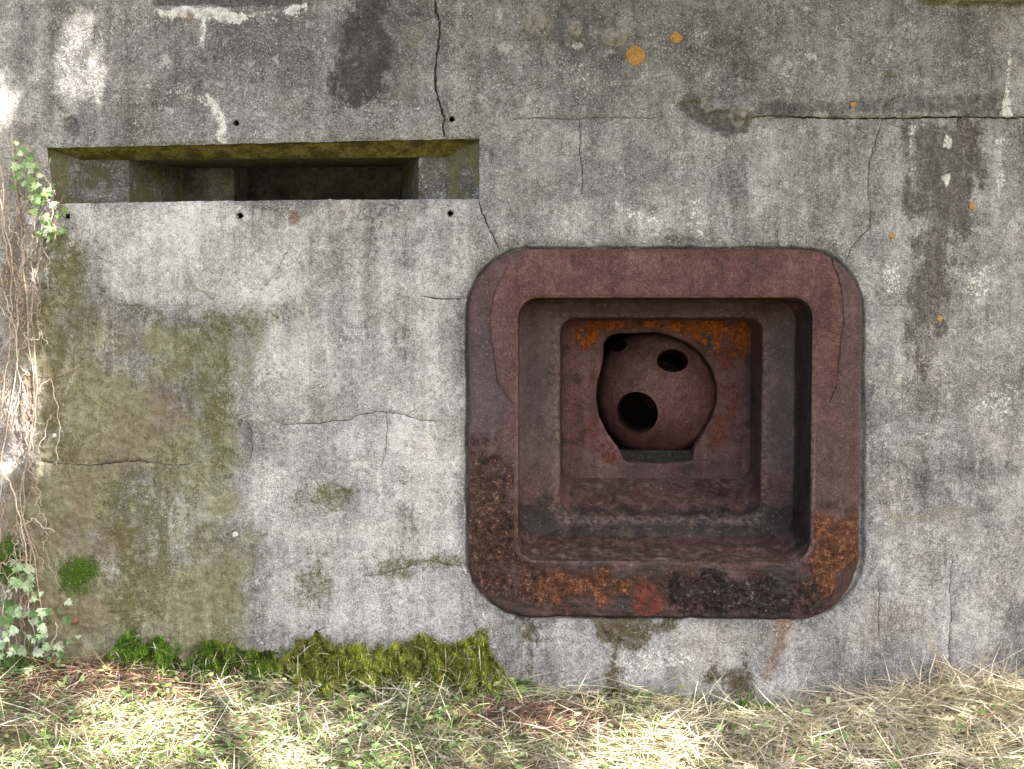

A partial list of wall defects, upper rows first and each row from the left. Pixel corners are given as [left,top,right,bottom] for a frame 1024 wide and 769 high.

efflorescence [154,2,315,48]
water stain [326,0,398,113]
efflorescence [174,87,229,144]
crack [520,116,668,194]
crack [750,101,1024,403]
water stain [759,46,1024,385]
water stain [24,232,90,473]
corrosion [575,321,750,362]
crack [38,459,195,467]
water stain [96,331,243,639]
crack [281,410,439,467]
corrosion [470,435,858,701]